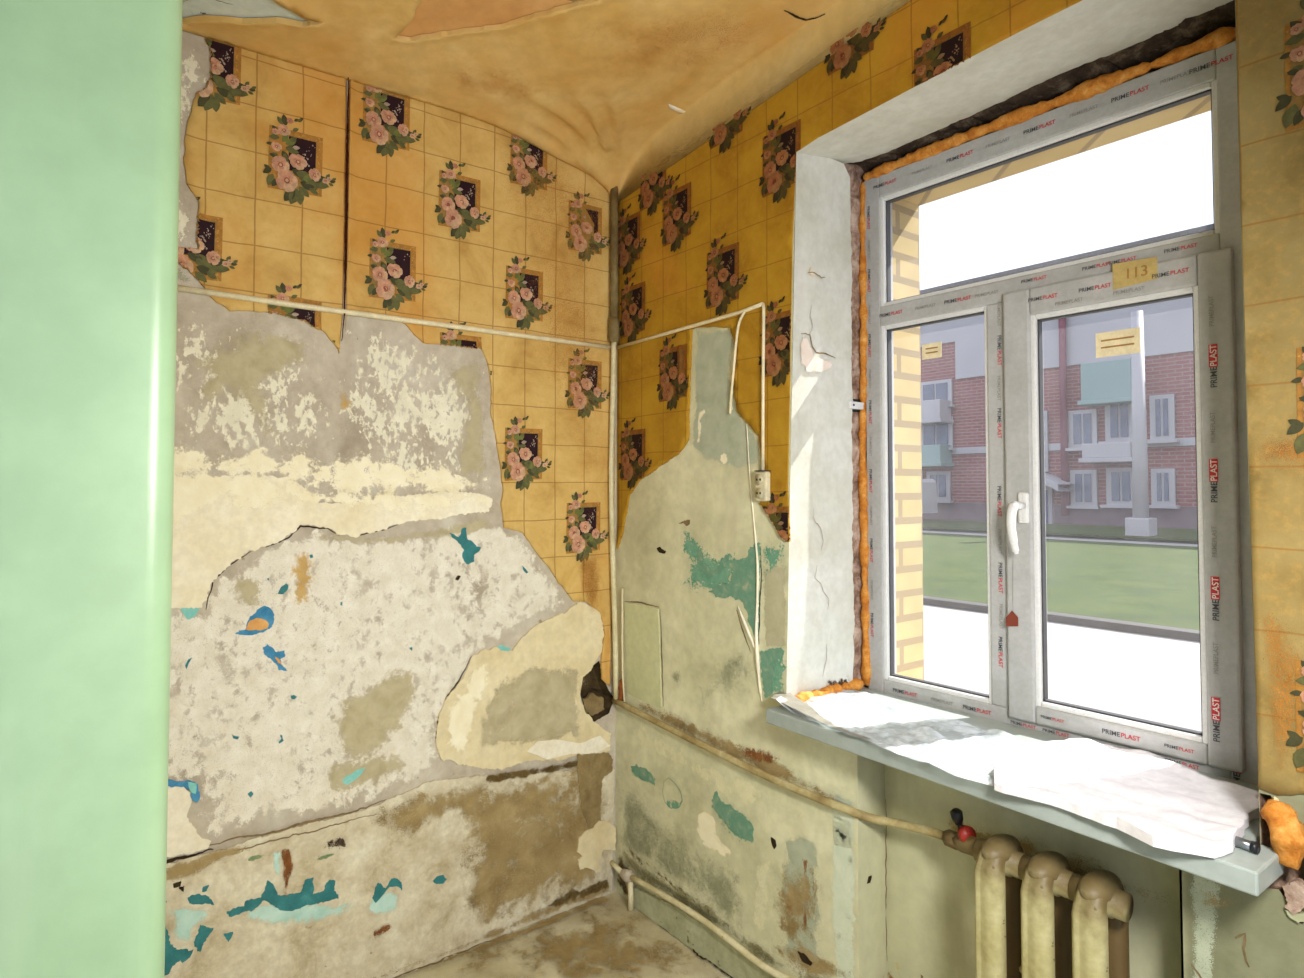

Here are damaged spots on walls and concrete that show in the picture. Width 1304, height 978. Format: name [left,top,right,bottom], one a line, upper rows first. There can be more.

flaking render [164,311,787,978]
water stain [327,838,346,849]
water stain [371,759,721,978]
peeling [830,792,872,978]
peeling [1188,873,1239,978]
flaking render [1259,793,1279,848]
flaking render [1267,865,1304,924]